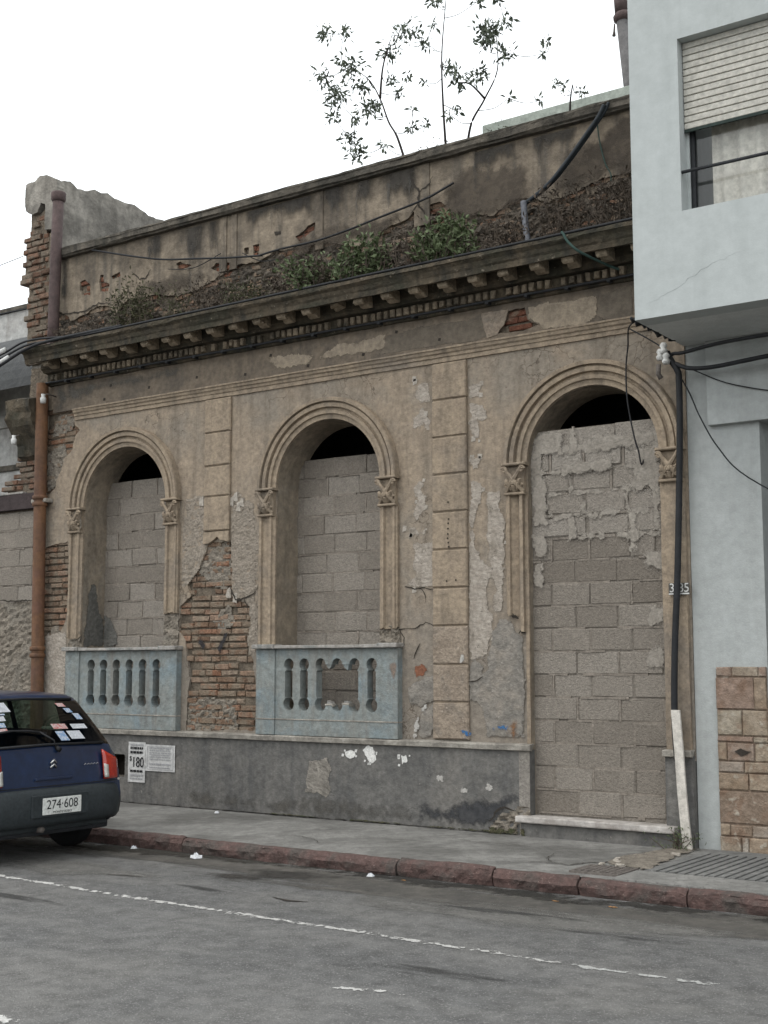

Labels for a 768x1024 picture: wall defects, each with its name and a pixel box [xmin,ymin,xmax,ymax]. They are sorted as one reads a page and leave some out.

flaking render [59,173,632,338]
flaking render [44,510,82,694]
flaking render [180,491,259,731]
peeling [468,381,506,660]
peeling [531,426,661,557]
water stain [420,796,517,825]